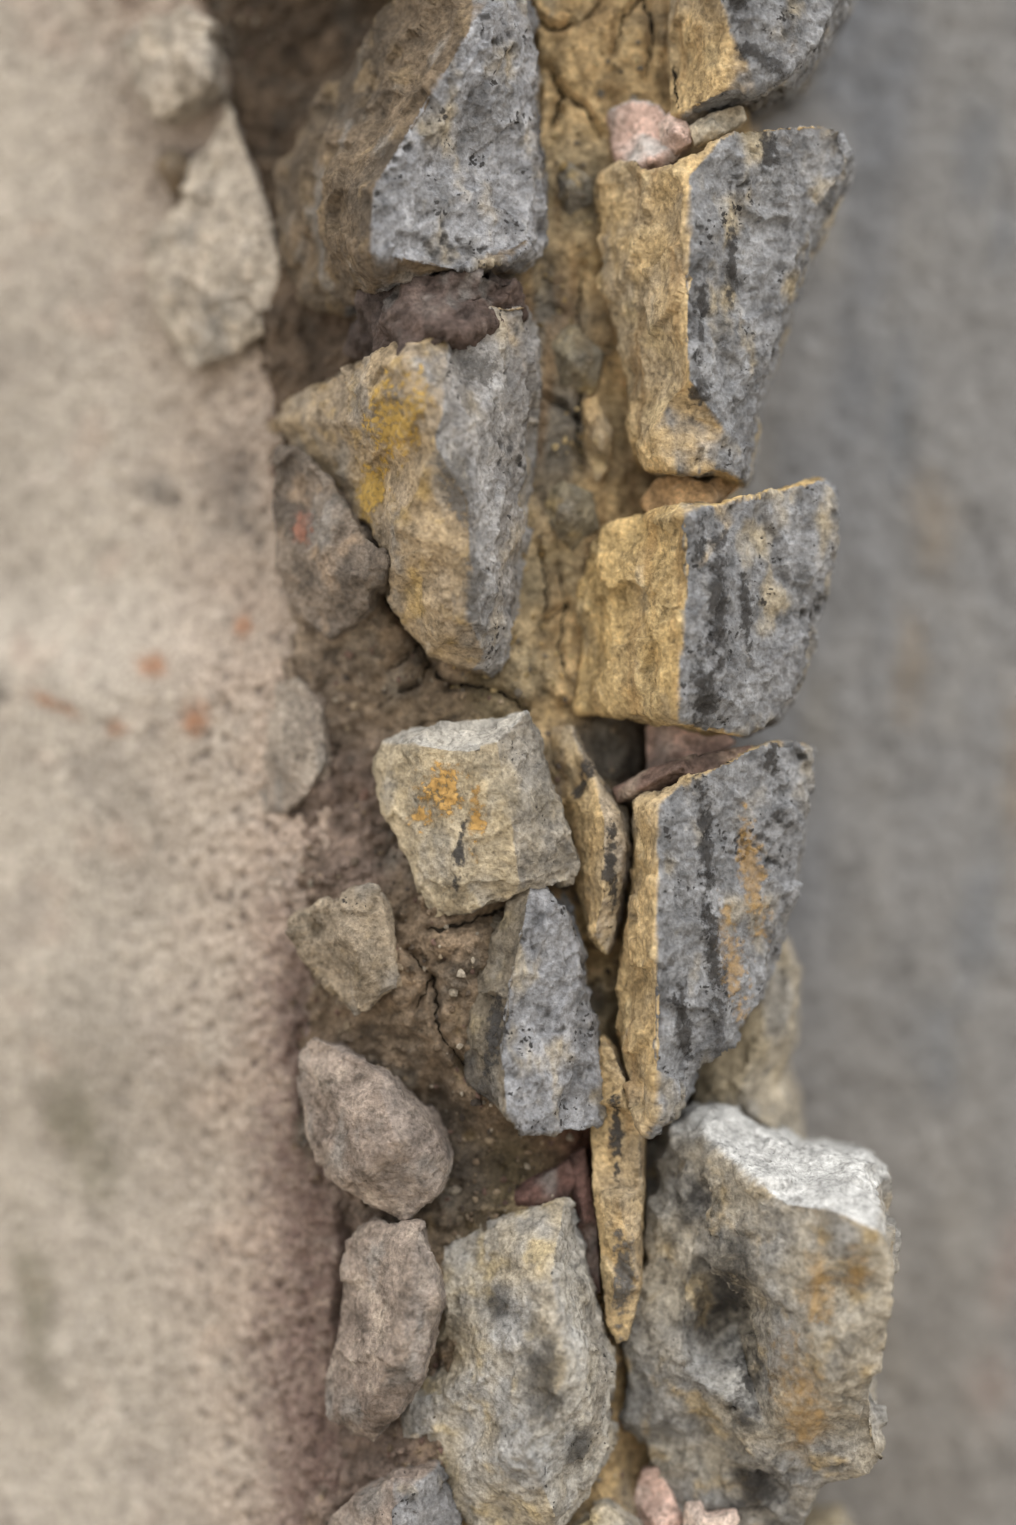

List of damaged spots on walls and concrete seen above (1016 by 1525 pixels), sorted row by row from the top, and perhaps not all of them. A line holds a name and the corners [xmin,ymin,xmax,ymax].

crack [531,0,679,135]
crack [576,268,584,329]
crack [542,393,583,472]
crack [385,598,524,710]
crack [537,546,568,682]
crack [410,907,505,1066]